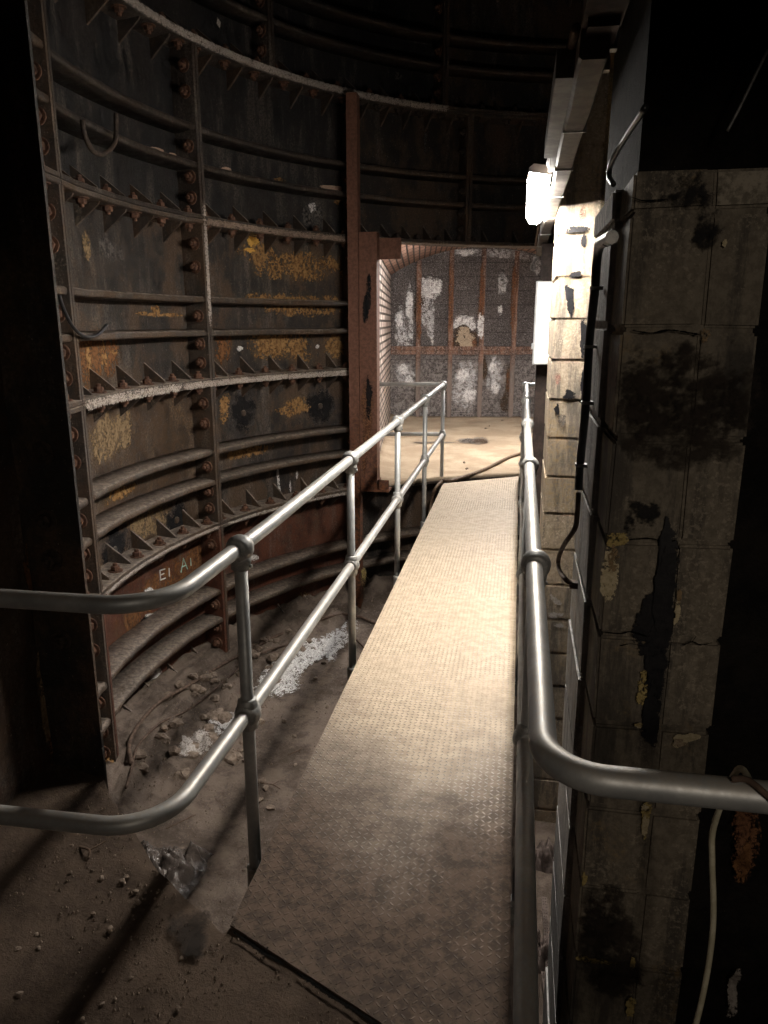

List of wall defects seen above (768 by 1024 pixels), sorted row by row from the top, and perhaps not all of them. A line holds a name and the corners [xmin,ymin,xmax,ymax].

rust [79,329,120,389]
spalling [453,323,478,347]
rust [361,378,373,474]
rust [731,811,761,883]